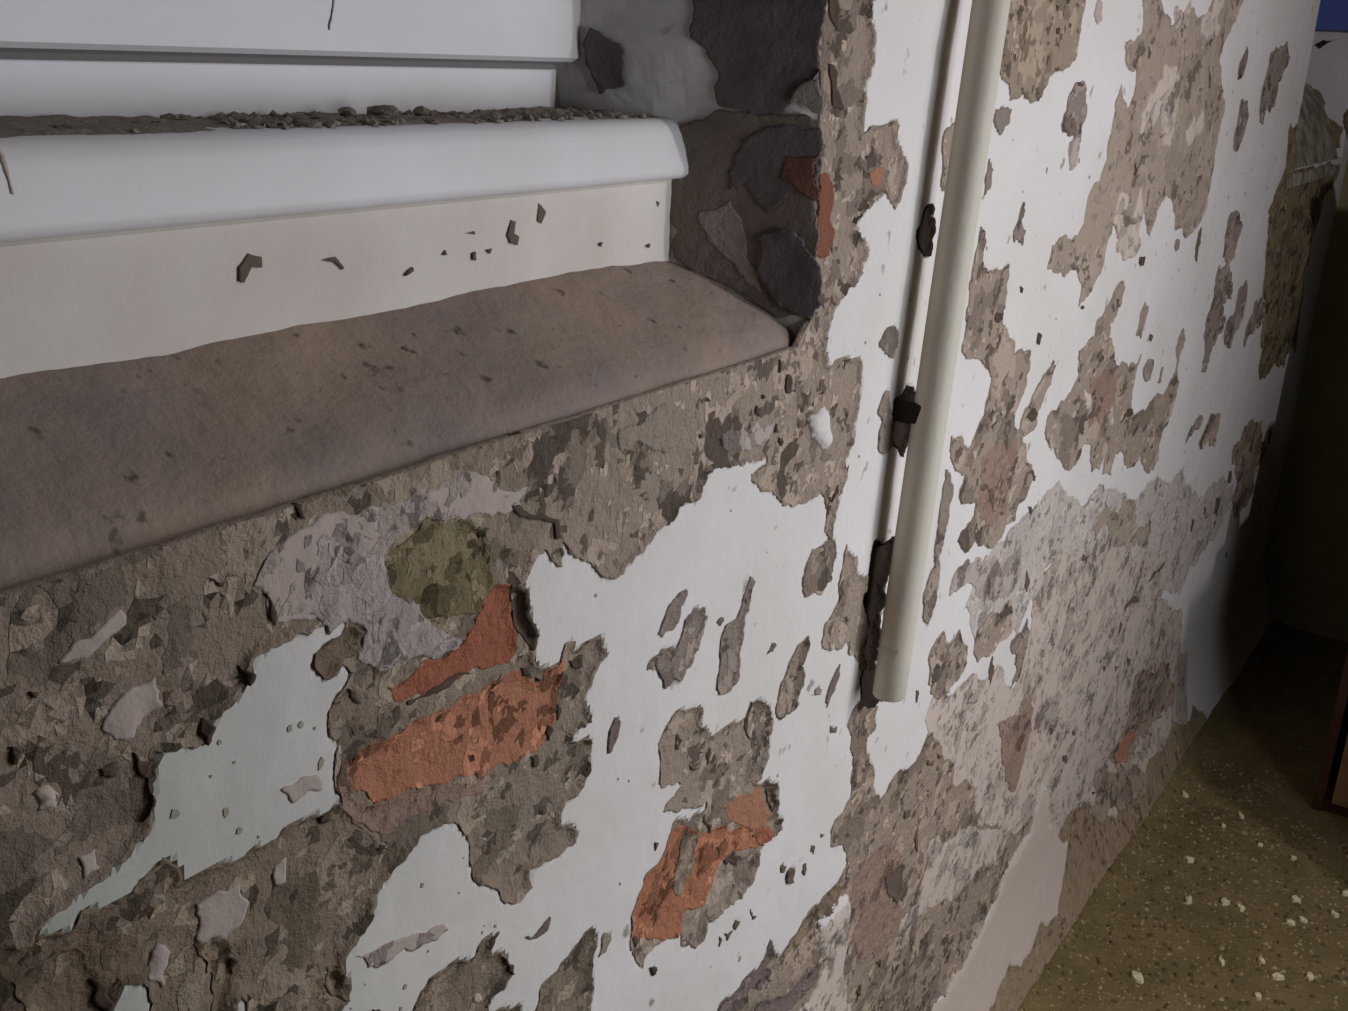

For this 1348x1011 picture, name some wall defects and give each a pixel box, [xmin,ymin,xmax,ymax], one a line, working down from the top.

peeling [984,159,993,195]
peeling [1012,202,1026,246]
spalling [993,0,1103,135]
peeling [1061,81,1087,170]
peeling [1174,227,1202,262]
spalling [1233,41,1291,152]
spalling [1201,123,1338,380]
spalling [0,0,909,1011]
spalling [915,226,1186,703]
spalling [1185,413,1220,449]
spalling [1191,418,1272,532]
spalling [717,699,1034,1011]